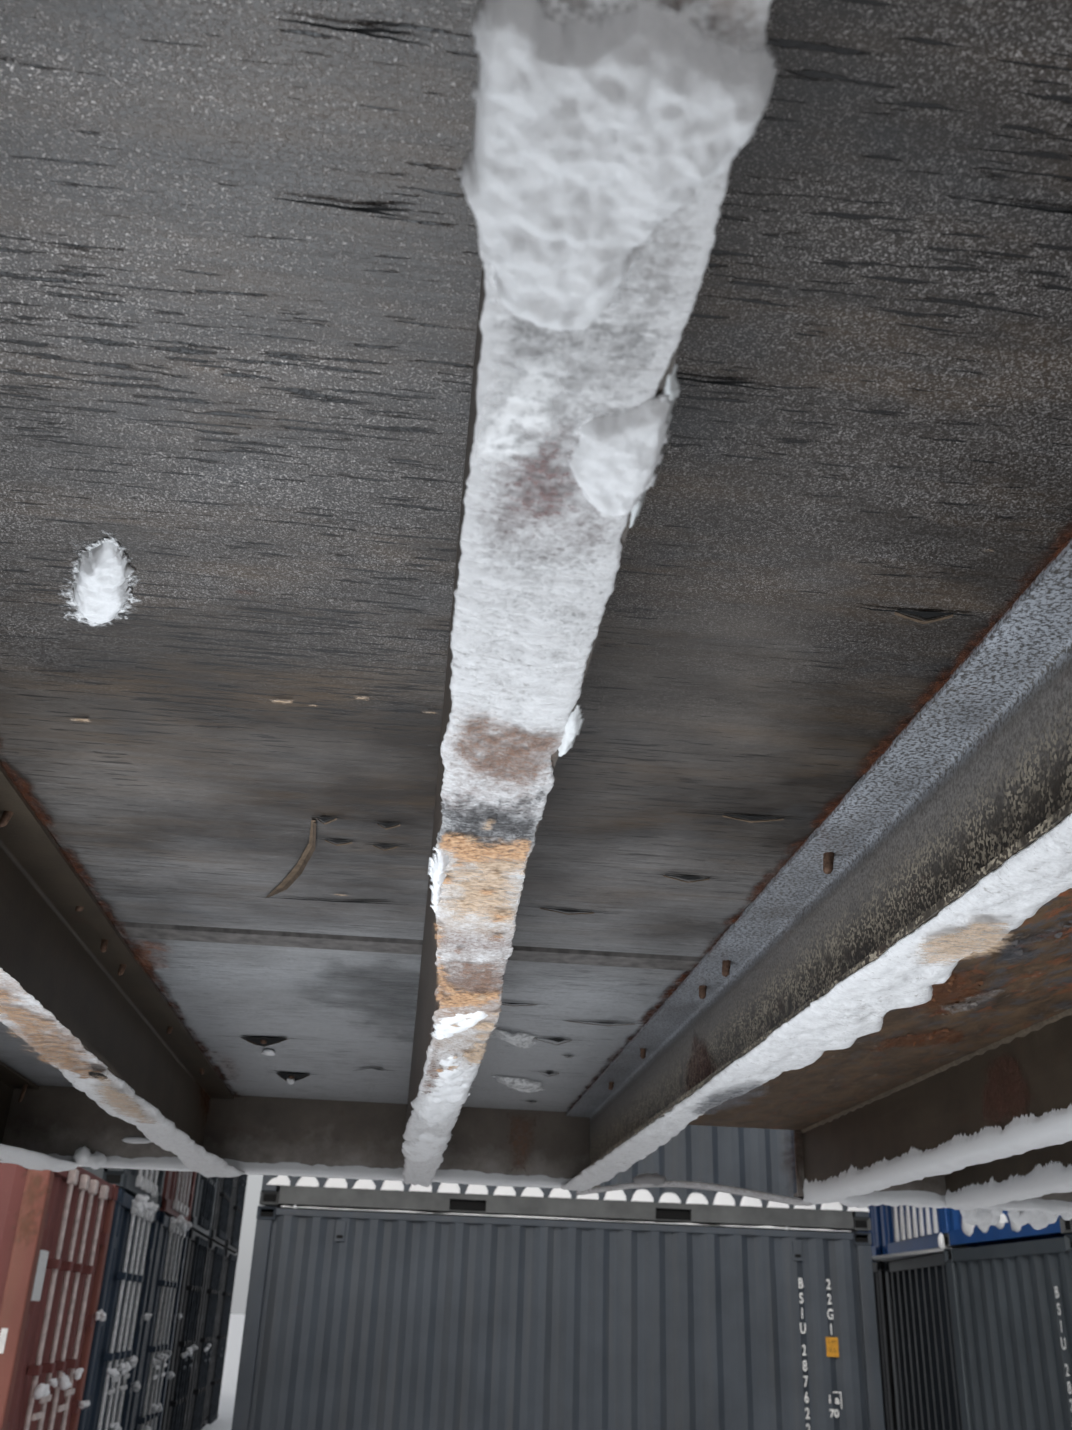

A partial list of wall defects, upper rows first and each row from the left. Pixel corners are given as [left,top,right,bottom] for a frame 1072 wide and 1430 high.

rust [453,711,556,785]
rust [858,525,1072,775]
rust [0,990,156,1124]
rust [1,763,239,1097]
rust [423,821,531,1094]
rust [568,799,844,1111]
rust [909,923,1012,1014]